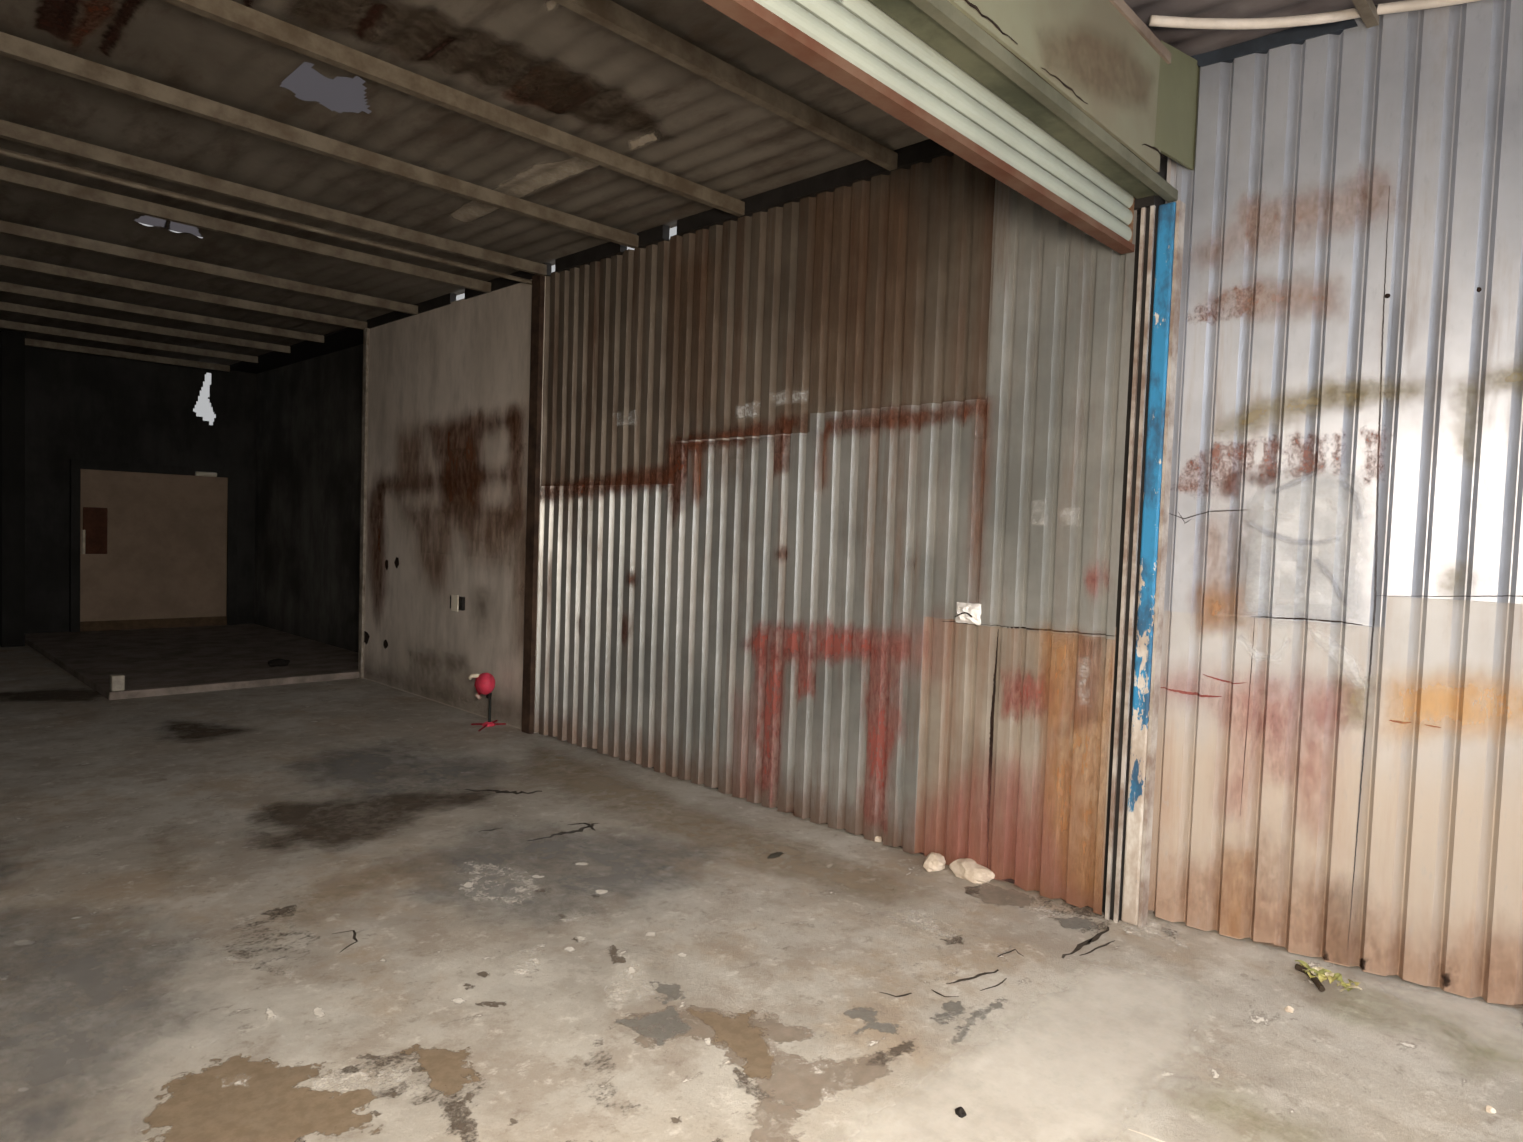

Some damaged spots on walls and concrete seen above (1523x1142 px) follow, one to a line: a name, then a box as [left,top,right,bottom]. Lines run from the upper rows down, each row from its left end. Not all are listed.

corrosion [35,0,142,56]
corrosion [1200,286,1326,321]
corrosion [370,412,522,607]
corrosion [540,417,806,520]
corrosion [823,403,987,483]
corrosion [1404,686,1505,723]
water stain [256,750,486,848]
spalling [451,956,506,1007]
spalling [604,945,914,1142]
spalling [140,1044,481,1142]